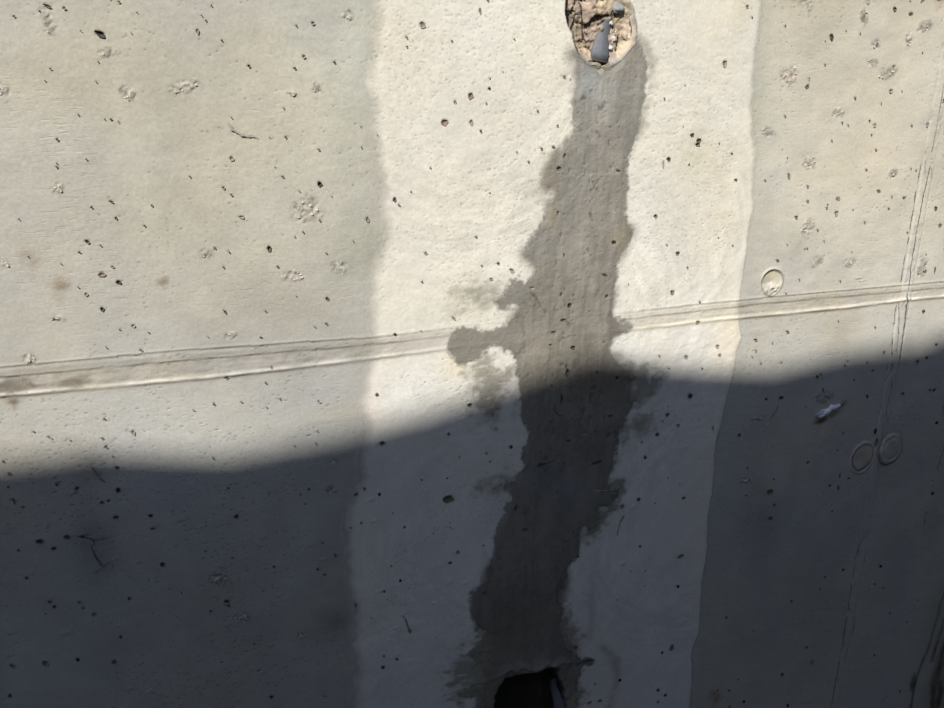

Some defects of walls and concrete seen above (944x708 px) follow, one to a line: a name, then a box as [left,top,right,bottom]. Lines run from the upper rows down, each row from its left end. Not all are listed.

spalling [565,0,637,70]
water stain [446,38,662,708]
crack [878,88,944,466]